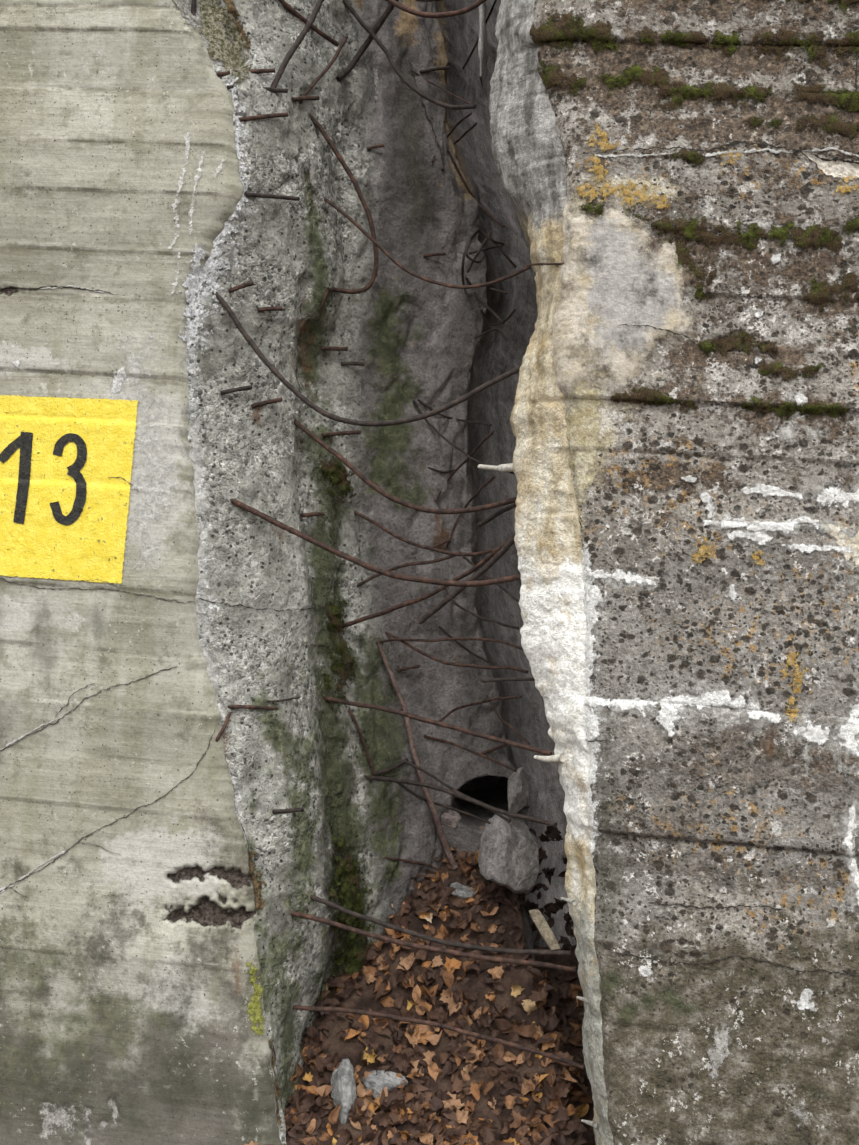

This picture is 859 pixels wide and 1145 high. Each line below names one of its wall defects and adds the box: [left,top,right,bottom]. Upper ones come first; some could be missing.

spalling [177,0,197,29]
crack [578,52,859,166]
damp [681,475,859,569]
crack [0,577,326,612]
spalling [212,0,614,1145]
crack [0,666,178,751]
damp [581,548,781,853]
damp [793,704,859,759]
crack [0,730,256,906]
spalling [164,866,256,929]
damp [835,806,859,917]